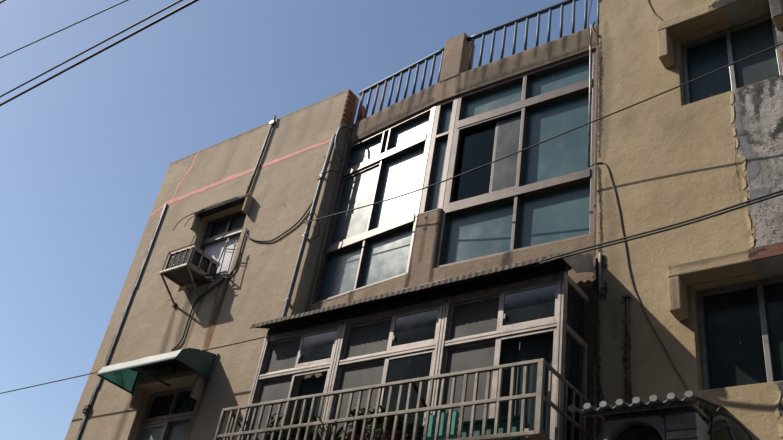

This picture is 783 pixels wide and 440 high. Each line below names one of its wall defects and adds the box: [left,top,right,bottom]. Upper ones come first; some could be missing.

rust [184,276,230,351]
water stain [456,24,609,437]
peeling [709,0,738,10]
peeling [730,0,783,260]